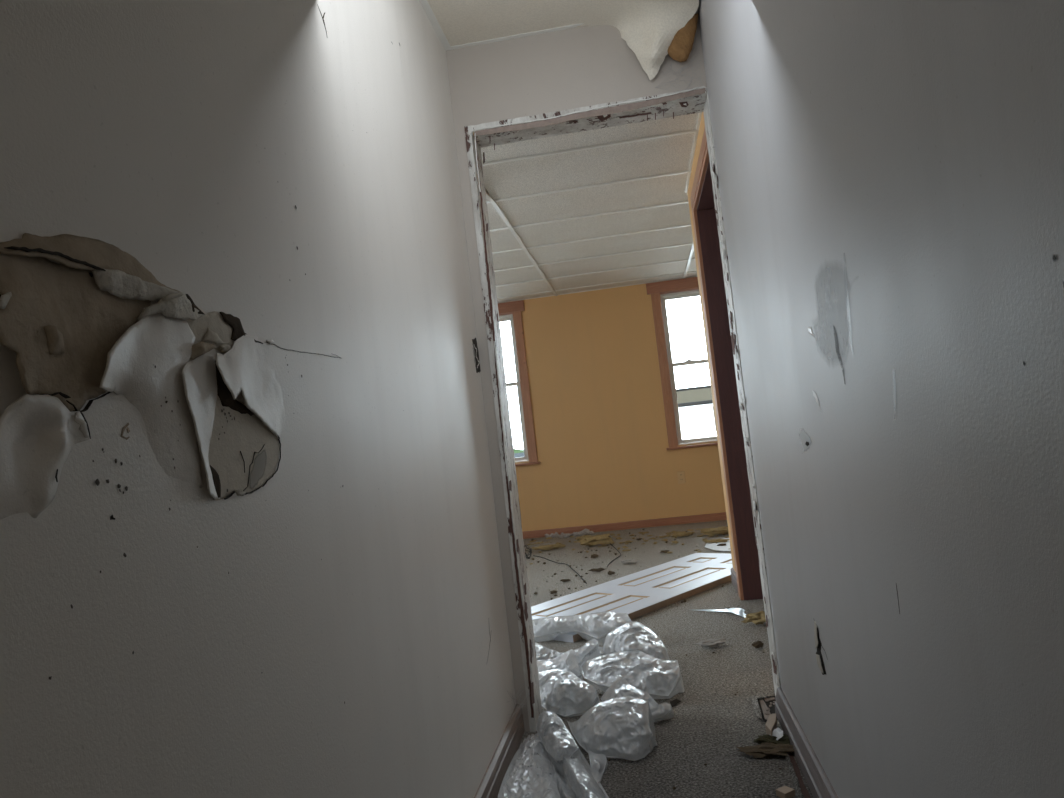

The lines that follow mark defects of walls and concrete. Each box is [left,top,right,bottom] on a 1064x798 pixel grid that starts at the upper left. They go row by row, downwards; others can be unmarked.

peeling [181,334,286,500]
spalling [471,338,481,373]
peeling [474,86,705,718]